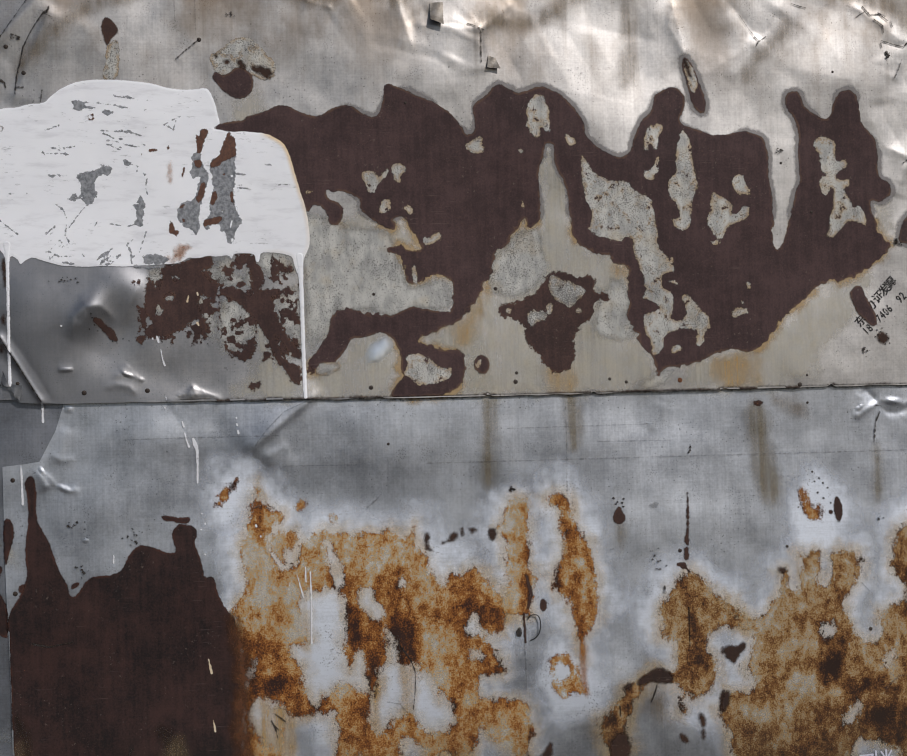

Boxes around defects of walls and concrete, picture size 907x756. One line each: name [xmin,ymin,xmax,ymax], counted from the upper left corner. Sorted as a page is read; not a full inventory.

peeling [169,129,247,243]
rust [0,476,547,756]
rust [546,490,599,699]
rust [599,492,907,756]
rust [797,477,843,521]